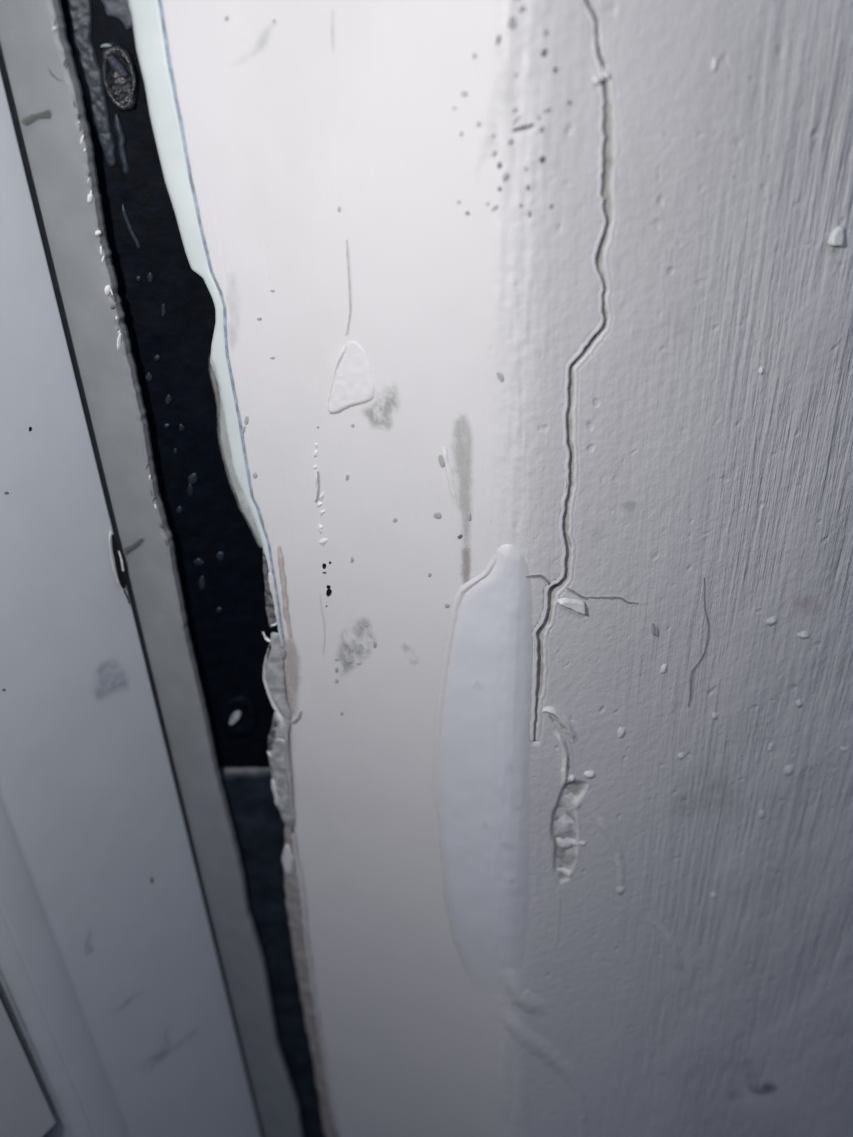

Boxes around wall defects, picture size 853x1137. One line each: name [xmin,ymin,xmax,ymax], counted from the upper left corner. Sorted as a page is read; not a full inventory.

spalling [104,285,121,351]
crack [526,0,638,741]
crack [687,577,710,707]
spalling [542,706,595,883]